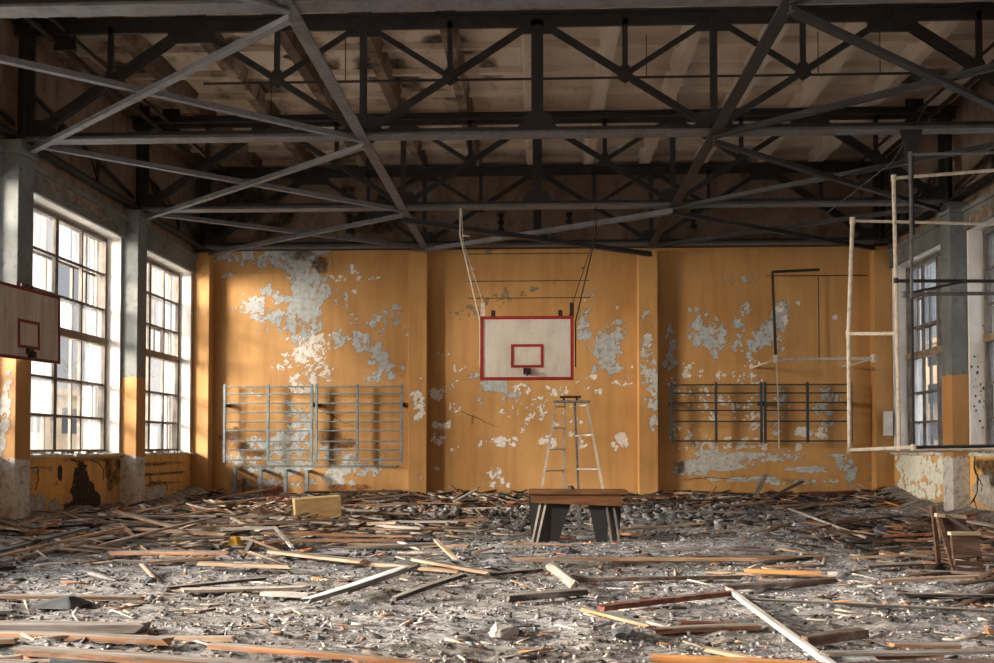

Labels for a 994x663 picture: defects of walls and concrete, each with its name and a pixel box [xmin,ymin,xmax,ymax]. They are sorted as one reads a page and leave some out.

flaking render [29,461,101,513]
peeling [214,251,409,489]
peeling [410,287,872,495]
damp [975,460,994,487]